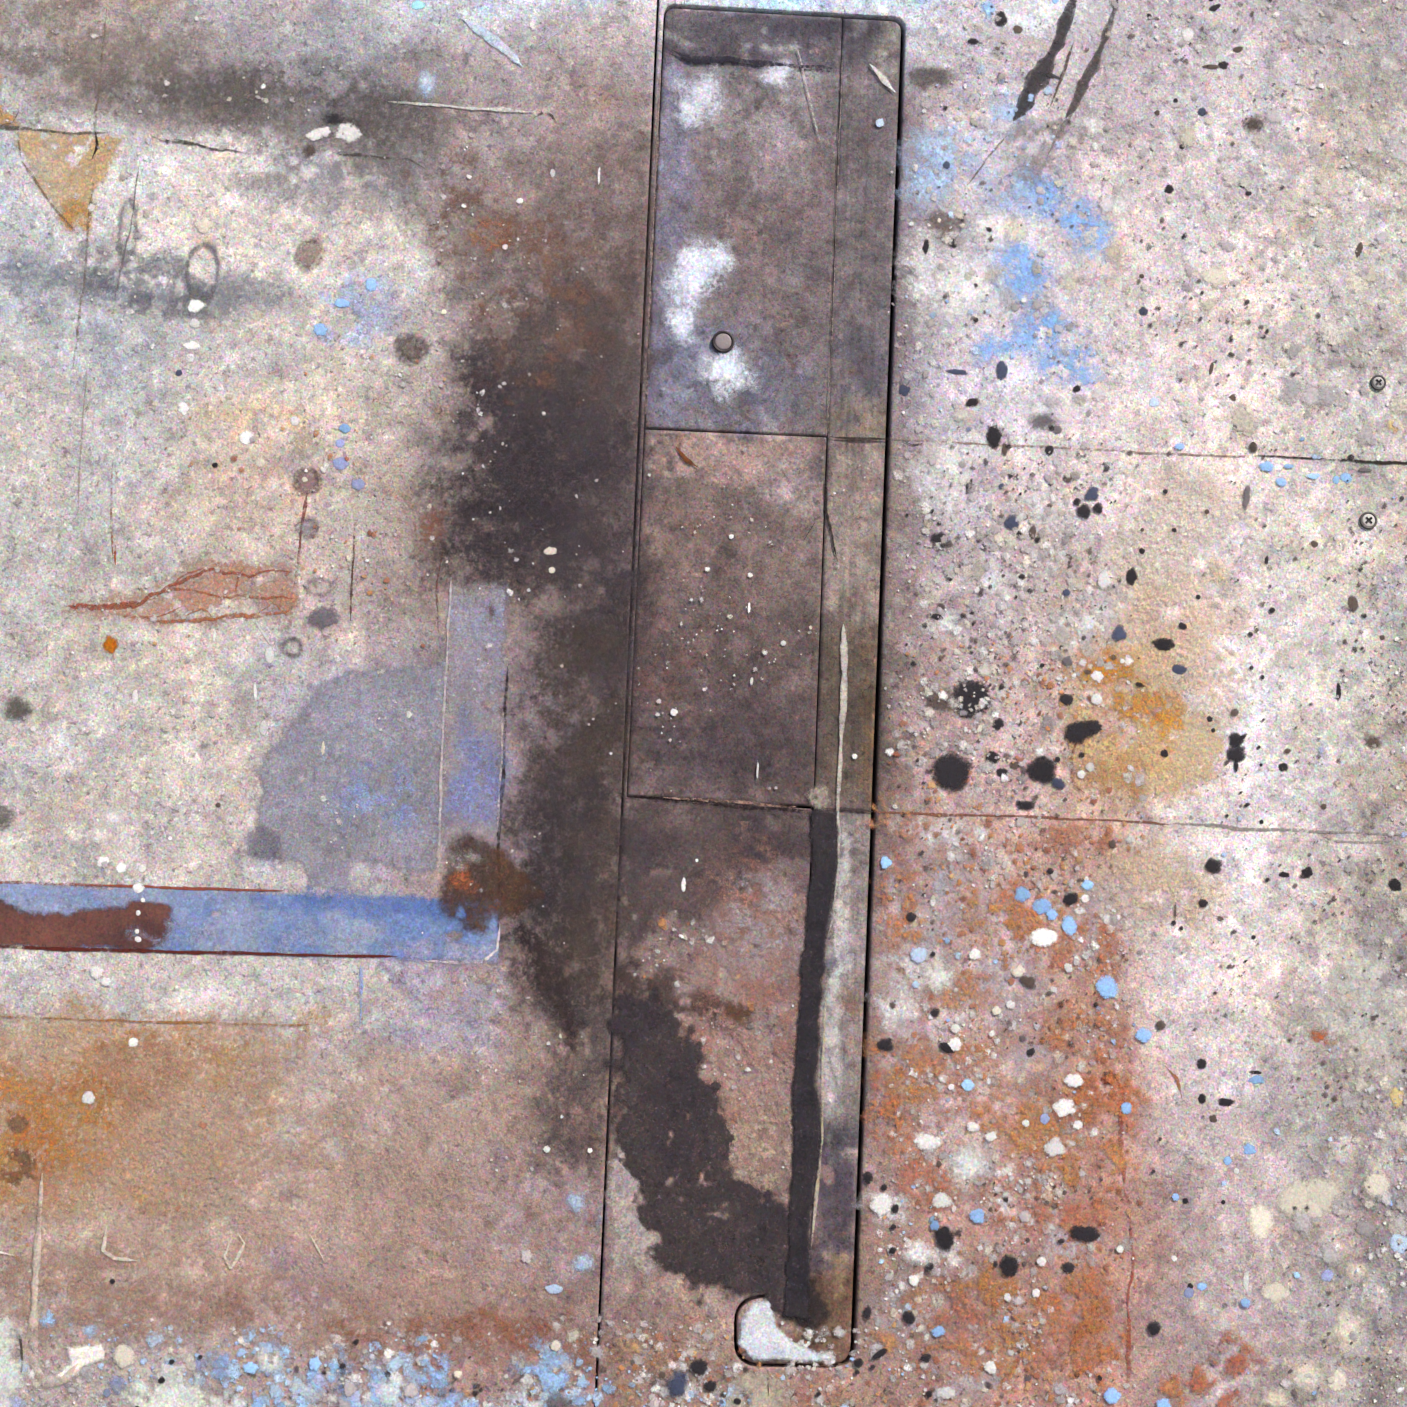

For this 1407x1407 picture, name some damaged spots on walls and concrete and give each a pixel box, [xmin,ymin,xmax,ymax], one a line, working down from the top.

rust [435,154,604,384]
damp [395,334,428,364]
crack [829,436,1407,469]
crack [804,480,836,556]
rust [63,554,317,636]
rust [103,636,118,653]
damp [418,266,660,1184]
rust [785,468,1267,1407]
rust [682,848,805,1189]
rust [0,993,596,1406]
damp [784,1277,831,1329]
rust [609,1328,782,1407]